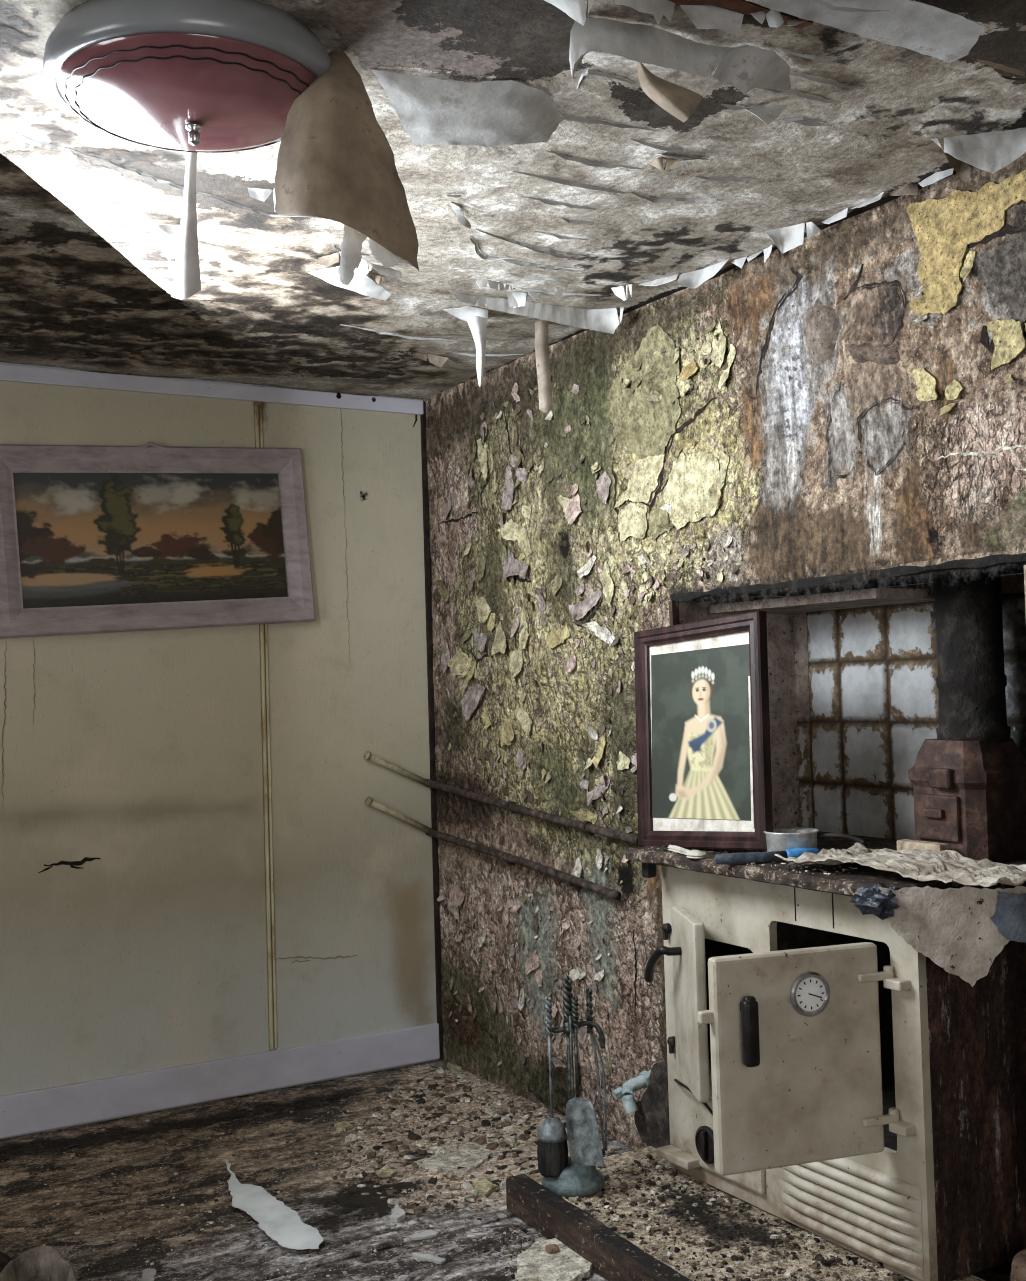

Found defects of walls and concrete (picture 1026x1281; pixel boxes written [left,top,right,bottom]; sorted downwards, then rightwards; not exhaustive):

mould [0,8,40,58]
mould [0,89,186,167]
mould [0,213,434,384]
peeling [754,170,1026,516]
crack [612,267,803,542]
damp [787,440,797,480]
crack [39,857,101,873]